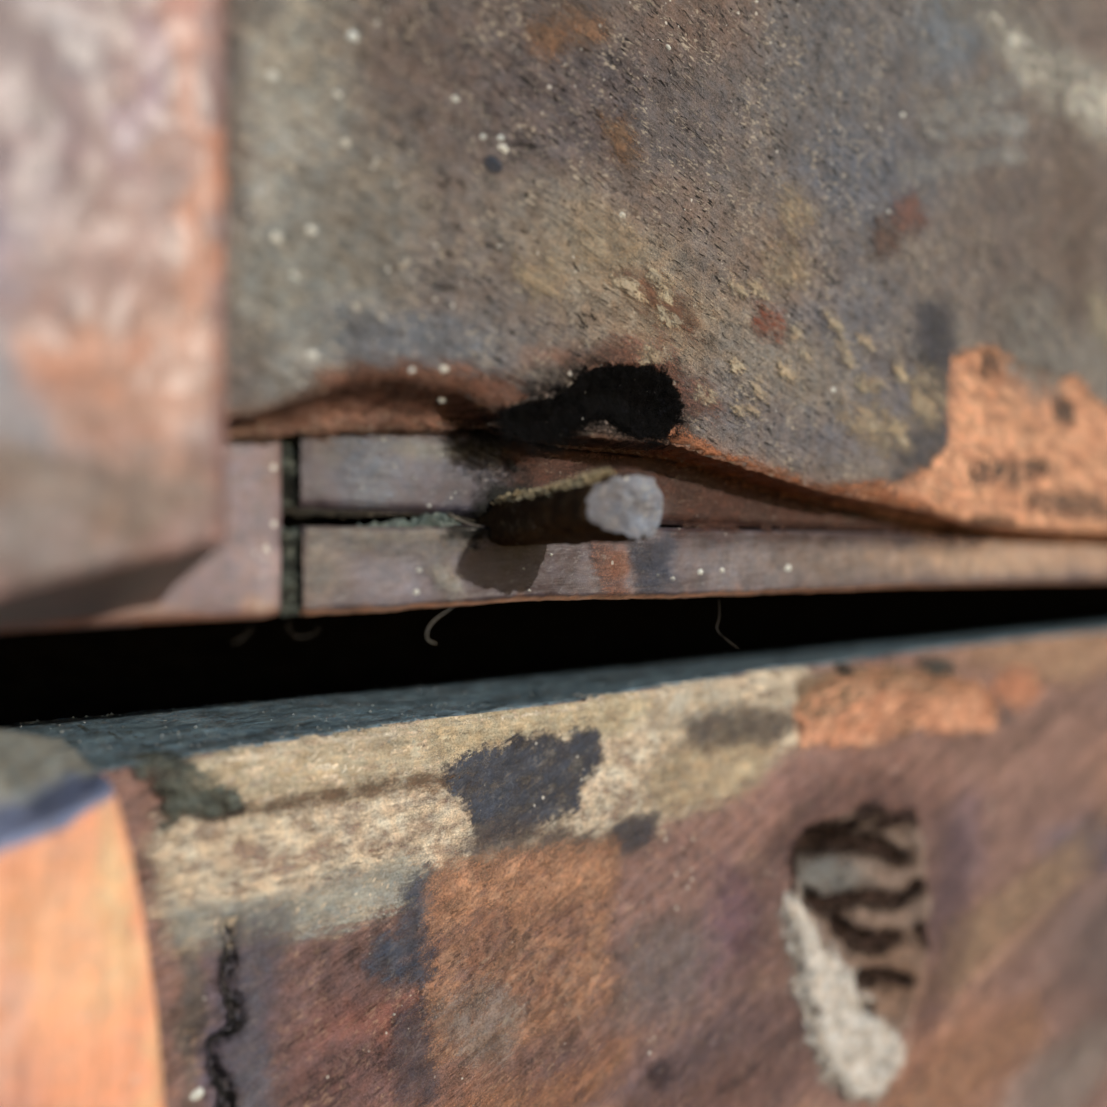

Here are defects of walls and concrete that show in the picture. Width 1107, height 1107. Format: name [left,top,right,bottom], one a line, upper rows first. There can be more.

spalling [646,342,1107,547]
leakage [441,725,663,869]
peeling [136,656,1018,1107]
crack [205,922,248,1107]